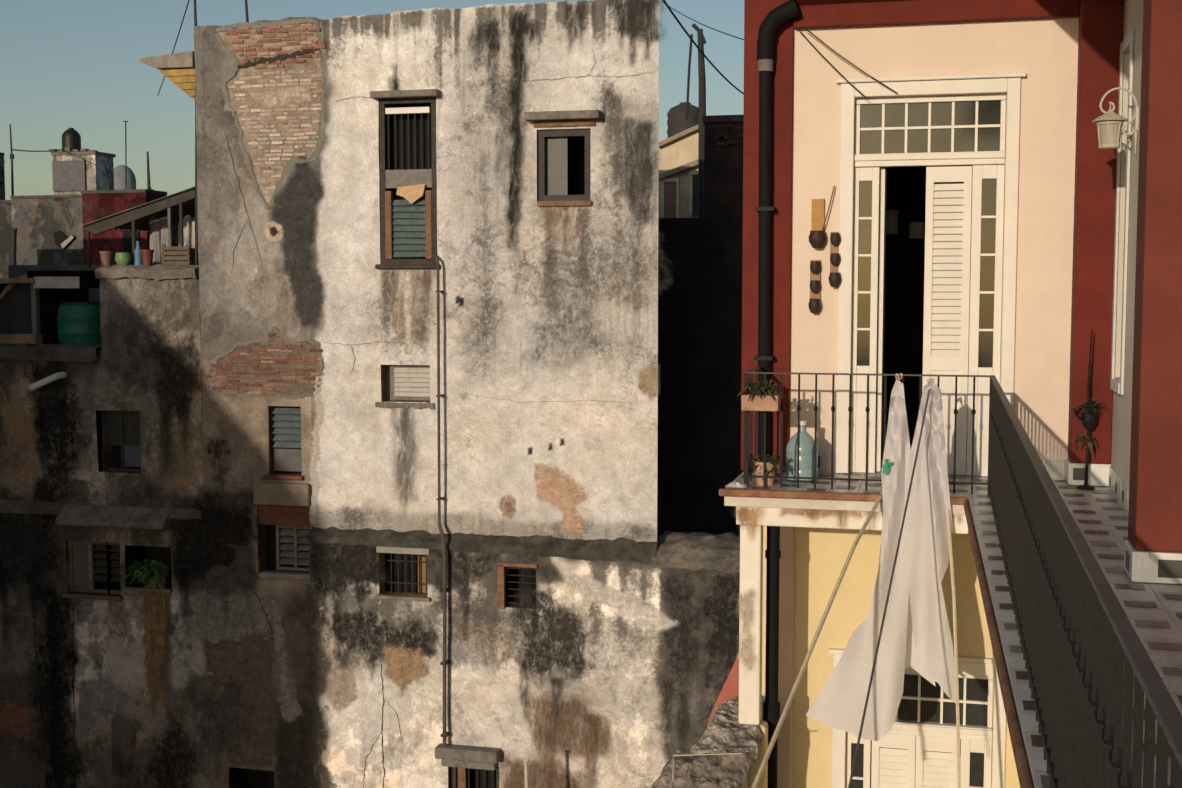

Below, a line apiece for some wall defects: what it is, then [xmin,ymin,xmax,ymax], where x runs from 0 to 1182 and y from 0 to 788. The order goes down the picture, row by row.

damp [611,0,663,60]
flaking render [215,18,329,243]
damp [471,12,535,247]
damp [620,119,656,216]
damp [271,157,323,326]
flaking render [205,326,325,400]
damp [170,439,260,614]
peeling [500,496,515,518]
peeling [528,448,585,537]
flaking render [383,645,428,686]
damp [517,590,592,709]
damp [571,574,740,753]